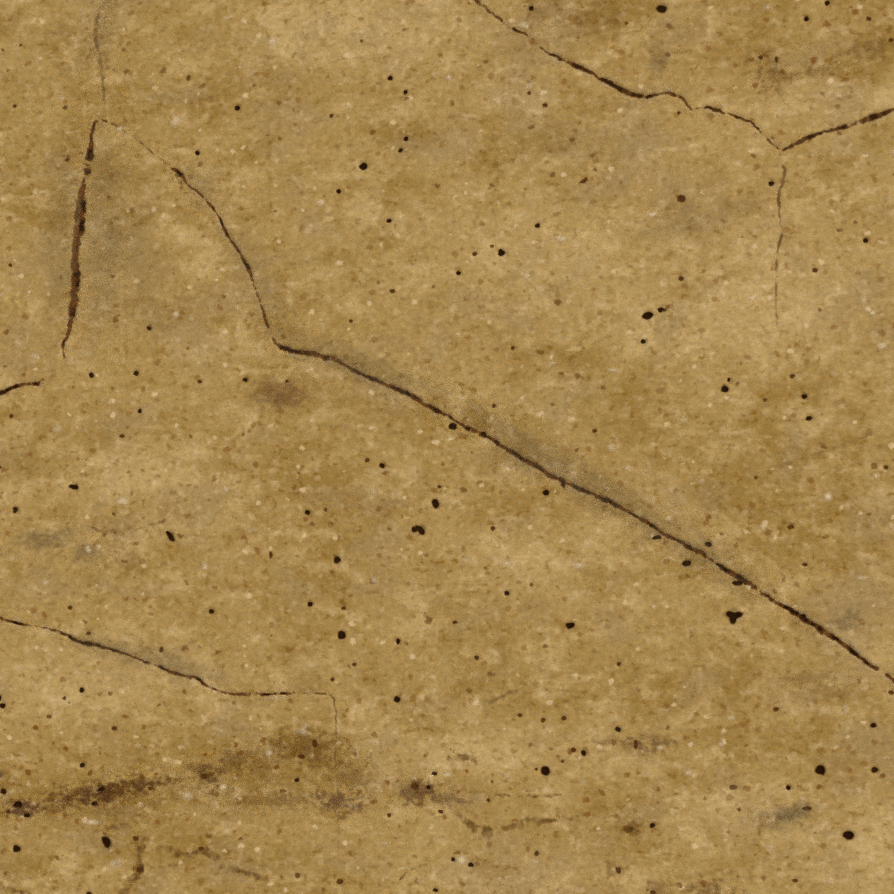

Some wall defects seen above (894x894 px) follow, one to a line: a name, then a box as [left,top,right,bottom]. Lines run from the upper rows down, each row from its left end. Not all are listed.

crack [61,119,117,357]
crack [475,0,894,290]
crack [0,381,40,395]
crack [171,168,894,683]
crack [0,617,291,696]